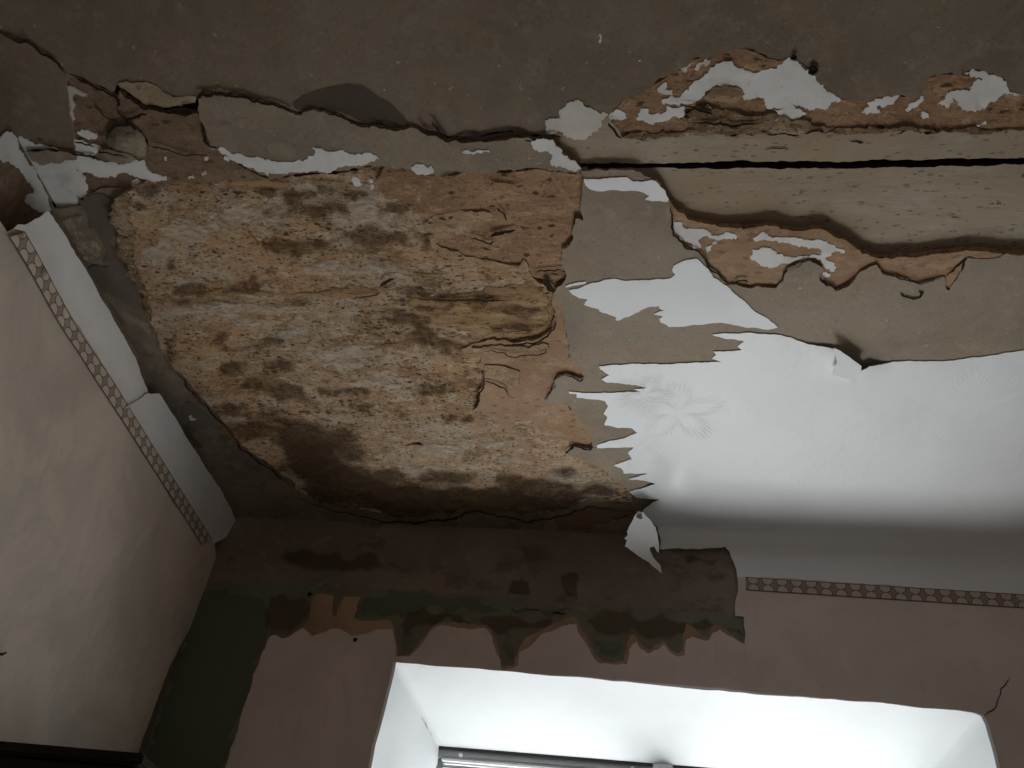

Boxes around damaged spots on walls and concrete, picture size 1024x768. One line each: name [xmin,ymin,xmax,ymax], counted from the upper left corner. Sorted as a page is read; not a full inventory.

crack [1,33,299,161]
crack [325,112,560,143]
flaking render [0,48,1024,450]
damp [174,276,309,329]
damp [180,328,622,519]
damp [402,608,552,634]
damp [588,611,712,638]
crack [984,679,1010,716]